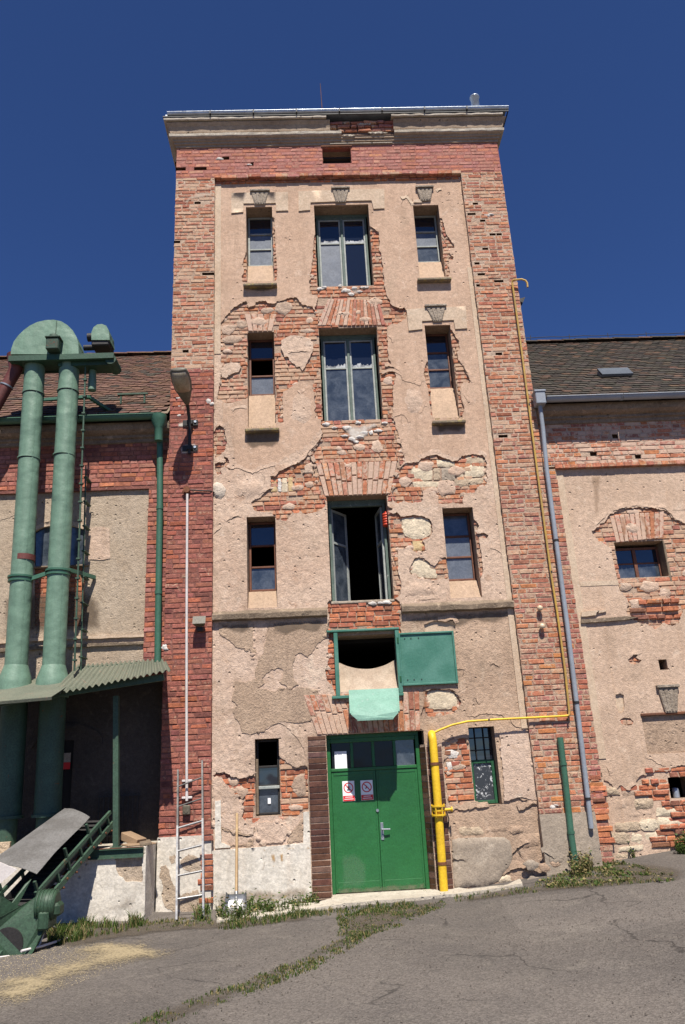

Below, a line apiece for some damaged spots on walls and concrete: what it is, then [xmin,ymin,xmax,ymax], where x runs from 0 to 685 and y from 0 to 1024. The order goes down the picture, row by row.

flaking render [213,422,232,474]
flaking render [218,219,488,735]
flaking render [473,520,492,578]
flaking render [591,505,685,629]
flaking render [204,756,309,848]